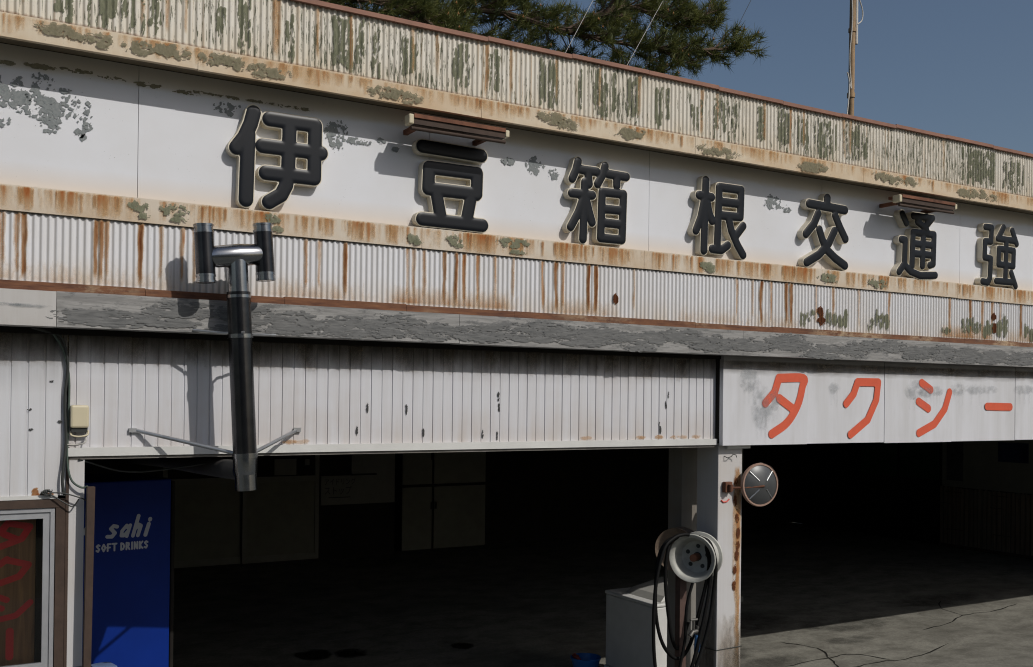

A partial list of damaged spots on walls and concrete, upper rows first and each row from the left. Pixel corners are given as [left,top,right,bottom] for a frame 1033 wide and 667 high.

peeling [0,60,309,142]
peeling [324,120,399,153]
peeling [332,15,424,104]
peeling [537,56,578,131]
peeling [578,68,670,140]
peeling [691,96,743,159]
peeling [757,106,917,187]
rust [0,185,34,275]
rust [50,191,132,277]
rust [180,229,195,279]
peeling [251,306,1033,365]
rust [732,469,741,653]